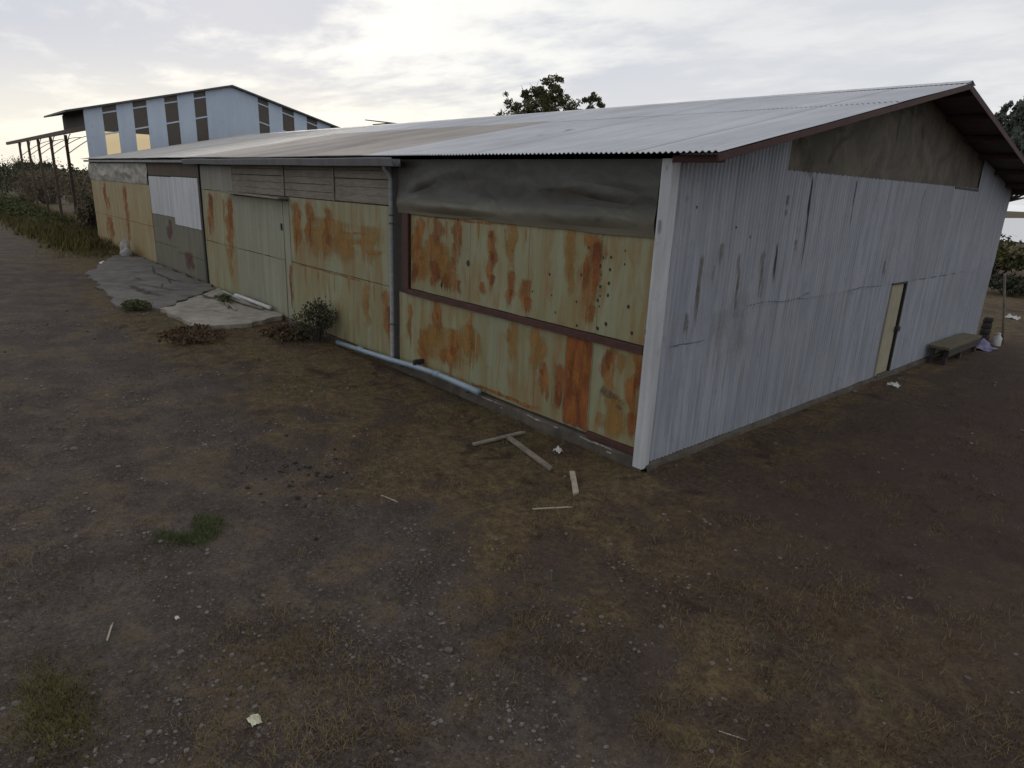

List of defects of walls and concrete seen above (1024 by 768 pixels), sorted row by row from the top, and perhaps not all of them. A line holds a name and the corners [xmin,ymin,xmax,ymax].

rust [208,194,234,275]
rust [292,204,381,255]
rust [289,265,390,332]
rust [408,302,480,372]
rust [411,215,531,312]
rust [565,230,602,321]
rust [531,327,643,436]